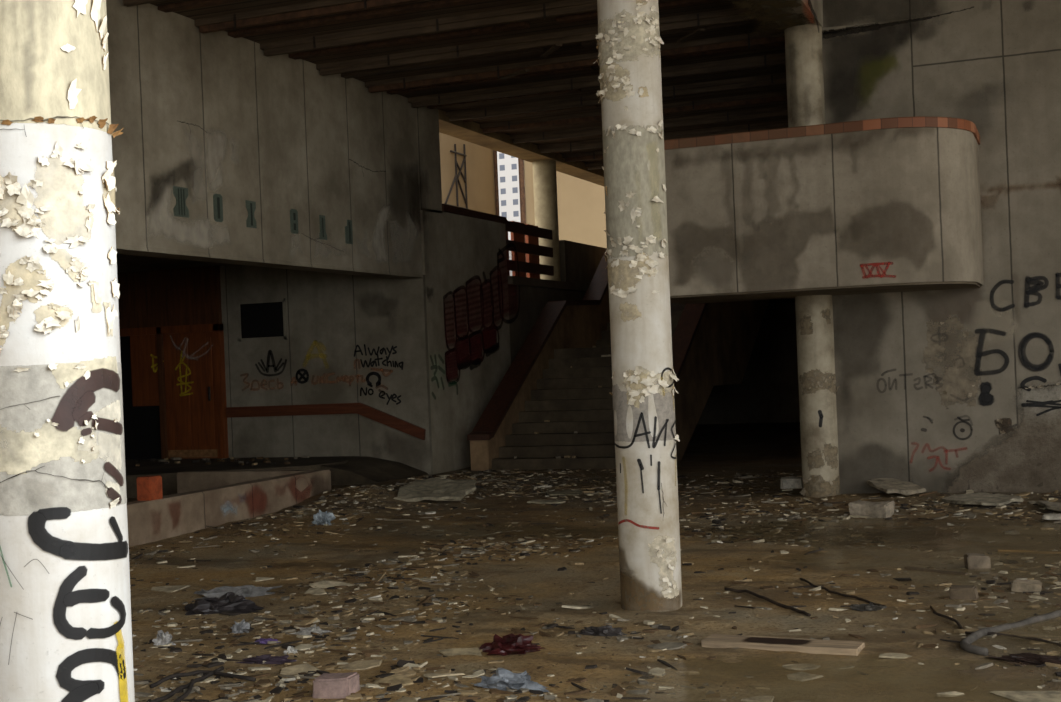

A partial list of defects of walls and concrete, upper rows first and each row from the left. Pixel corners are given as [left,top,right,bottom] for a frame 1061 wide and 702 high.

peeling [0,0,123,138]
peeling [594,0,664,111]
leakage [823,0,934,123]
peeling [0,141,120,351]
peeling [602,120,669,322]
crack [0,396,60,410]
crack [0,466,110,490]
peeling [0,356,127,516]
peeling [610,366,680,442]
spalling [946,382,1061,493]
peeling [648,535,679,599]